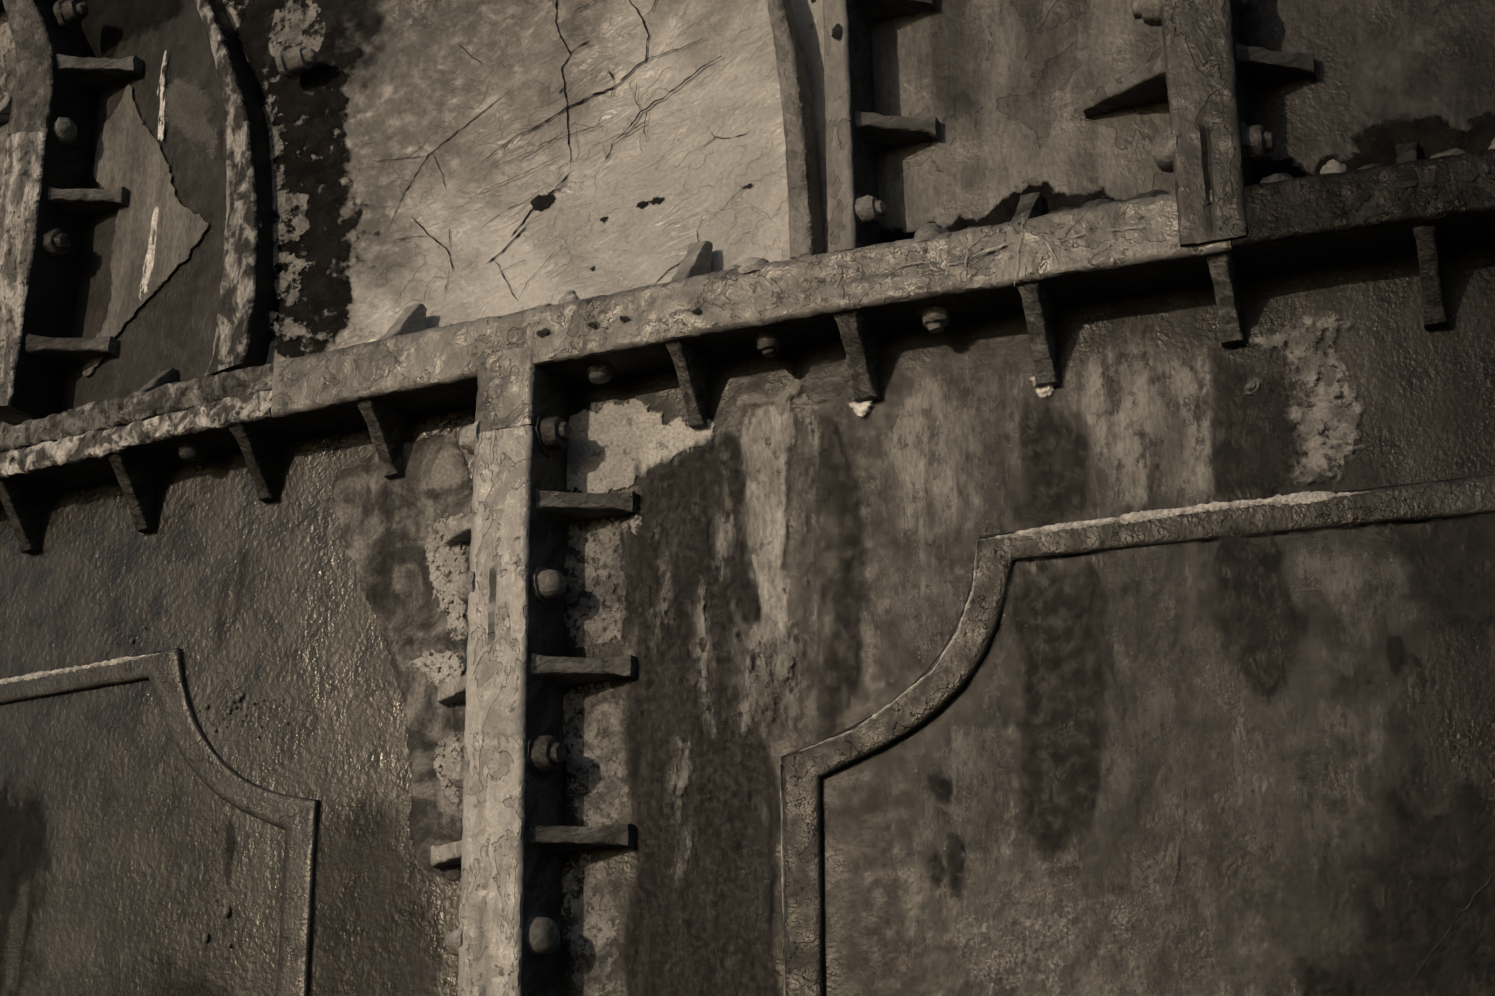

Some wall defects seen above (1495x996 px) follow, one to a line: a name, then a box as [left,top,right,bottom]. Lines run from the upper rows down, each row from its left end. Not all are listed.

peeling [221,0,380,358]
crack [377,0,722,299]
peeling [567,398,715,493]
water stain [0,784,47,996]
water stain [0,651,182,684]
peeling [332,430,473,881]
water stain [561,311,1370,996]
water stain [848,513,1495,996]